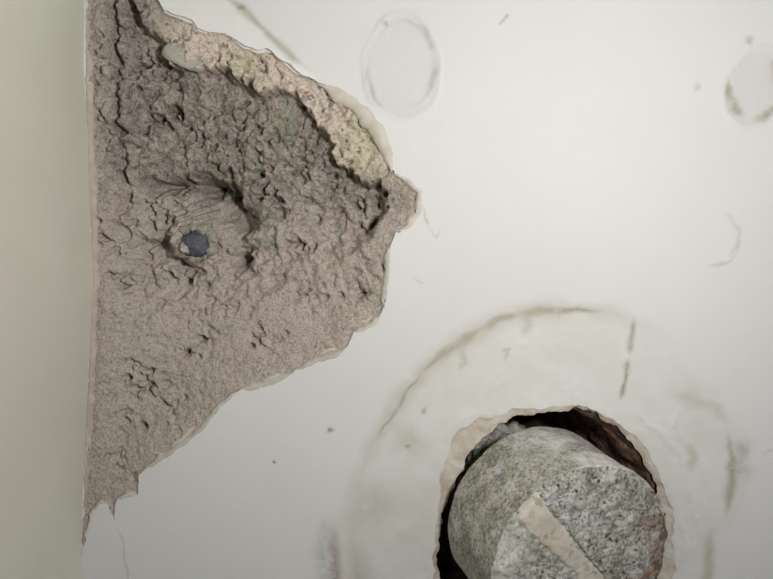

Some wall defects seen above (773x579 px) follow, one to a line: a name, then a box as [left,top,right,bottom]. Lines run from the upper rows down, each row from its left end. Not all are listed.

spalling [81,0,422,547]